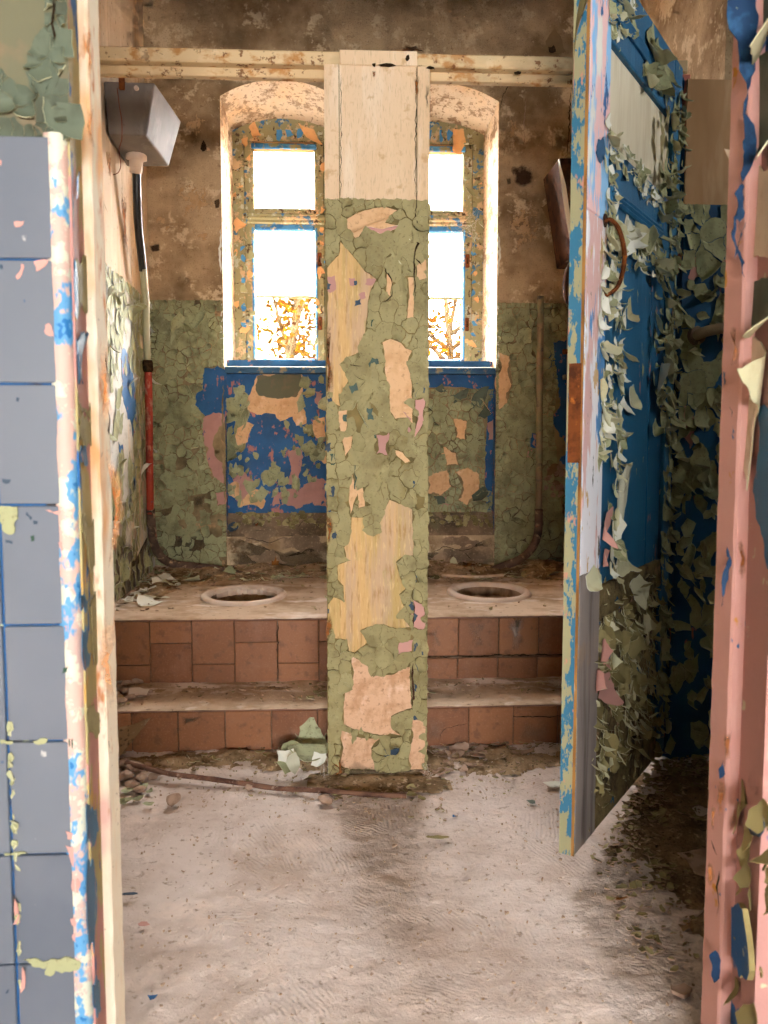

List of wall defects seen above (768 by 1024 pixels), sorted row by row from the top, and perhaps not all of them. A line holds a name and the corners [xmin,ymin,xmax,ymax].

peeling [0,0,85,142]
leakage [513,166,532,186]
peeling [750,0,768,258]
peeling [74,255,88,320]
peeling [78,402,92,466]
peeling [585,0,728,808]
peeling [737,277,768,569]
peeling [105,243,569,775]
peeling [80,591,98,671]
peeling [86,703,100,739]
peeling [66,803,99,953]
peeling [732,779,768,915]